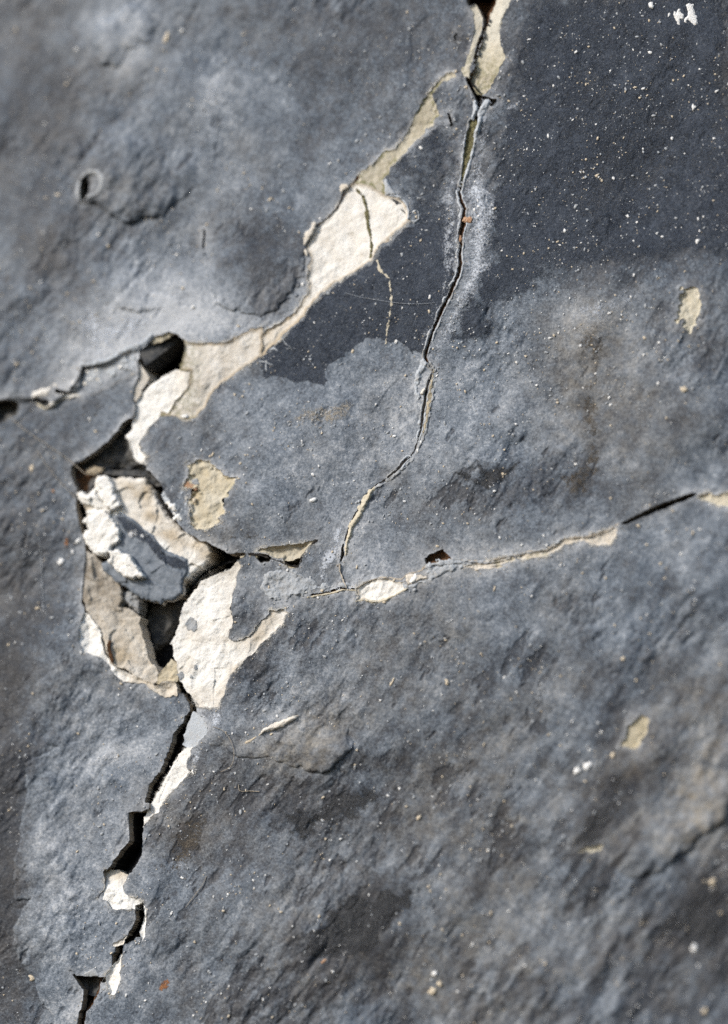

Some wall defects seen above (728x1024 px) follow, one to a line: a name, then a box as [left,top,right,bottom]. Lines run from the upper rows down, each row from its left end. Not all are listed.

spalling [125,70,459,466]
crack [185,0,728,604]
peeling [450,0,728,349]
crack [76,686,208,1024]
spalling [161,459,238,536]
spalling [170,554,289,710]
spalling [620,715,649,749]